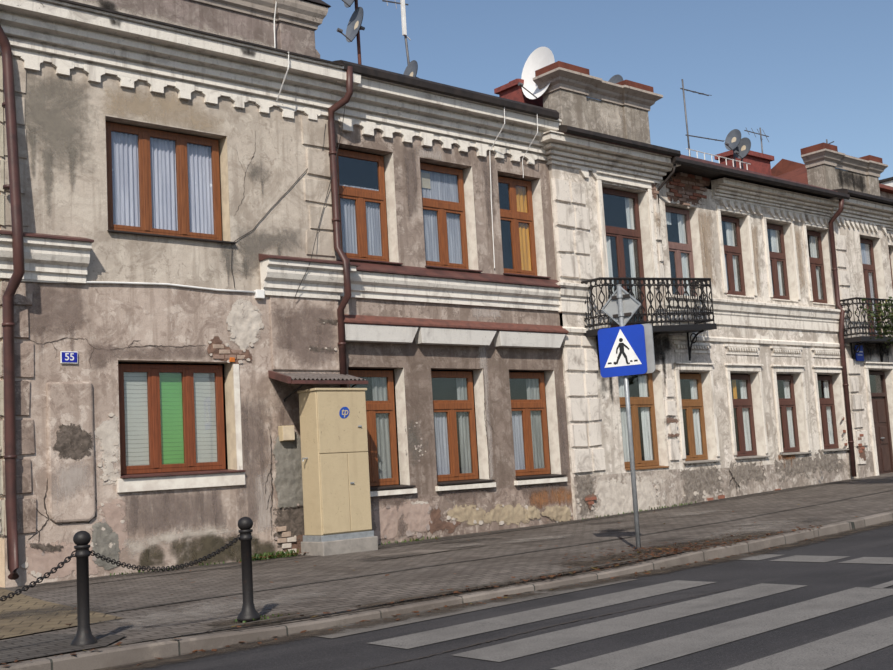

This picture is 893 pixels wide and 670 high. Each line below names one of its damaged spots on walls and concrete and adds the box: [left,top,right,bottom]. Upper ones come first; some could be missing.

water stain [25,79,87,207]
crack [234,131,256,216]
spalling [646,172,710,209]
flaking render [207,298,264,365]
flaking render [53,413,122,485]
crack [28,478,49,543]
flaking render [21,540,77,579]
flaking render [88,499,128,575]
water stain [126,491,234,560]
spalling [273,503,305,553]
spalling [372,500,531,540]